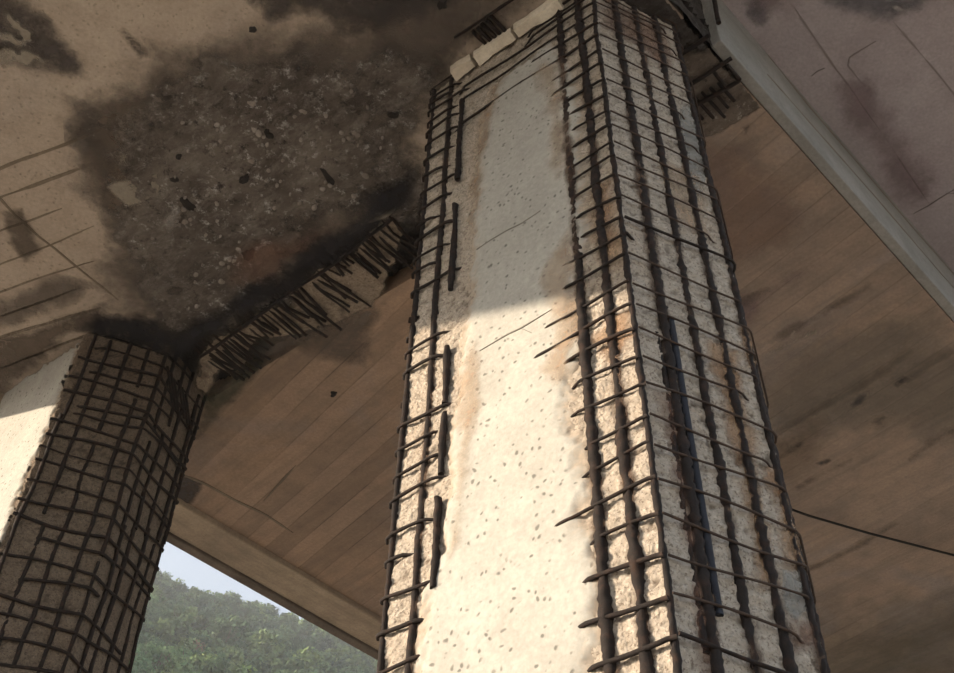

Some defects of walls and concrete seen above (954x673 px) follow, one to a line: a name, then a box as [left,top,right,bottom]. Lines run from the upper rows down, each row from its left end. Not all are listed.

leakage [0,0,80,73]
leakage [222,0,520,83]
rust [558,47,566,84]
rust [628,15,669,106]
rust [563,114,575,192]
rust [556,209,577,261]
rust [661,167,715,236]
leakage [0,252,188,393]
rust [549,270,587,374]
rust [605,316,630,422]
rust [714,321,753,462]
spalling [0,221,403,673]